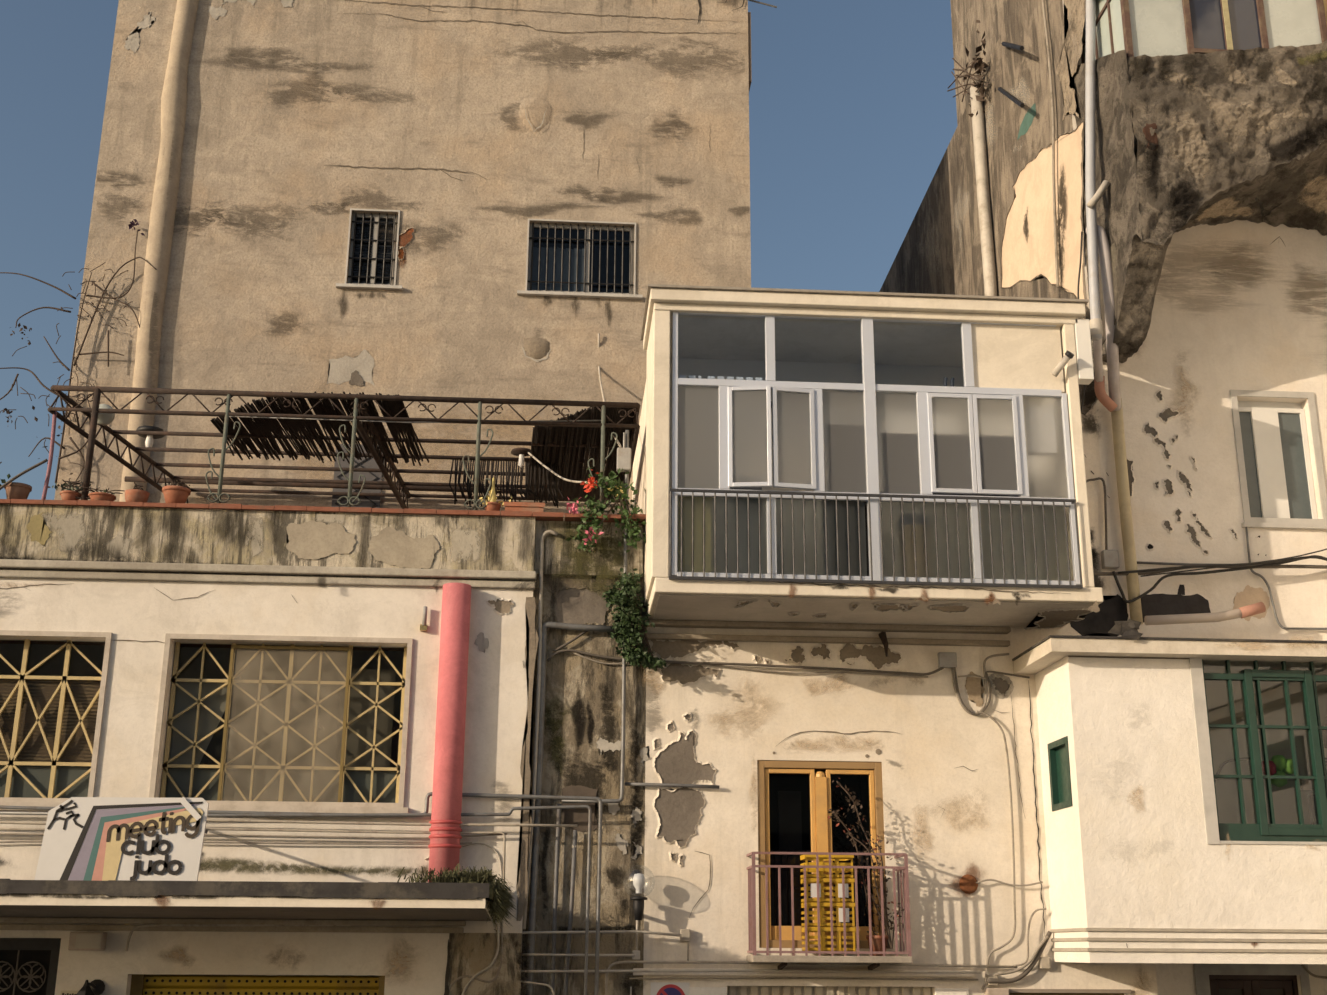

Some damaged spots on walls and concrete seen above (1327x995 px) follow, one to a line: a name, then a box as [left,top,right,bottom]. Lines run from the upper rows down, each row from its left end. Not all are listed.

peeling [124,11,156,55]
peeling [1126,456,1136,499]
peeling [1142,389,1214,556]
damp [0,505,68,561]
damp [84,508,182,563]
damp [359,516,369,567]
peeling [286,514,480,569]
damp [485,518,501,563]
peeling [648,640,903,687]
damp [545,686,645,853]
peeling [562,712,718,868]
damp [558,868,636,931]